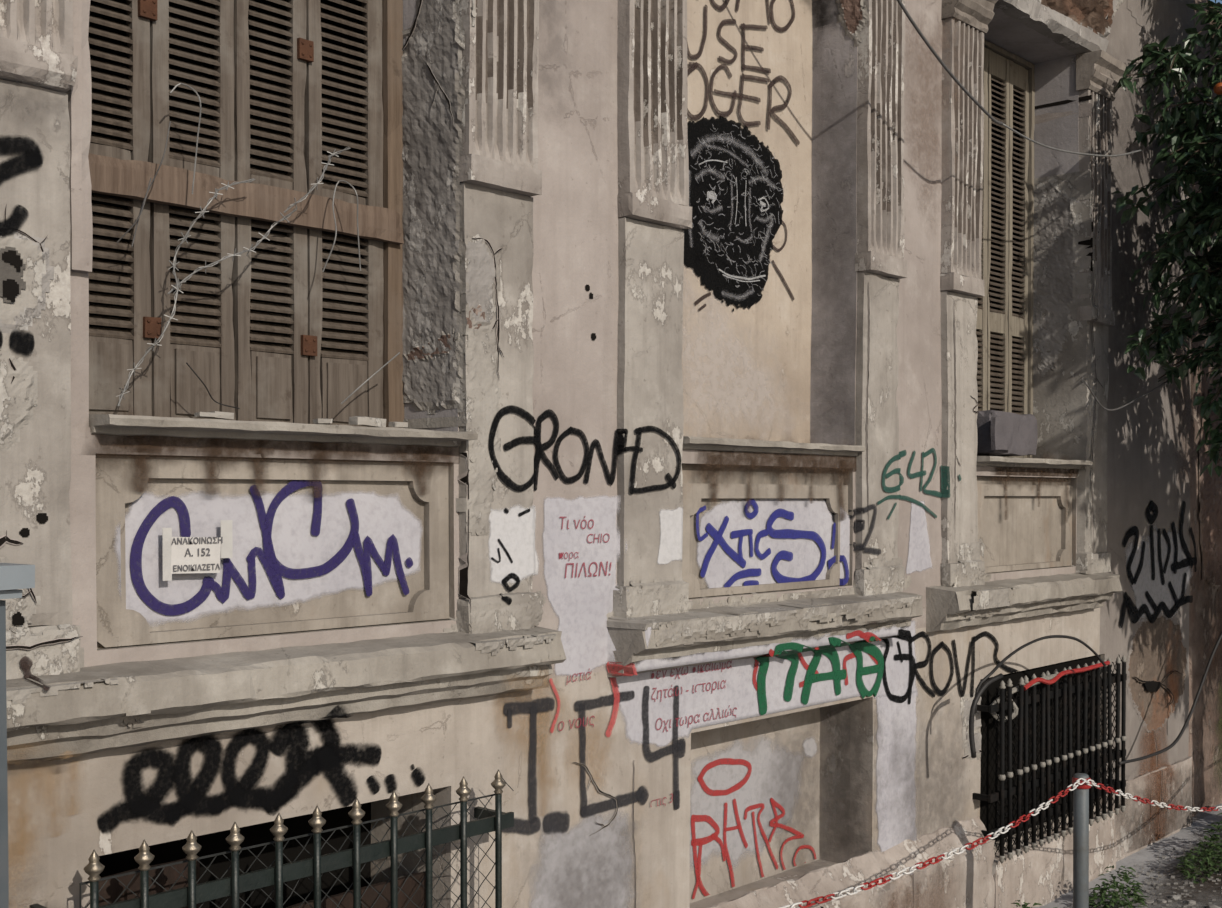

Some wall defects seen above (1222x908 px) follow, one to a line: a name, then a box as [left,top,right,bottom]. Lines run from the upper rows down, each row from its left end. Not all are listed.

spalling [0,231,54,451]
spalling [402,0,501,536]
peeling [1033,170,1100,573]